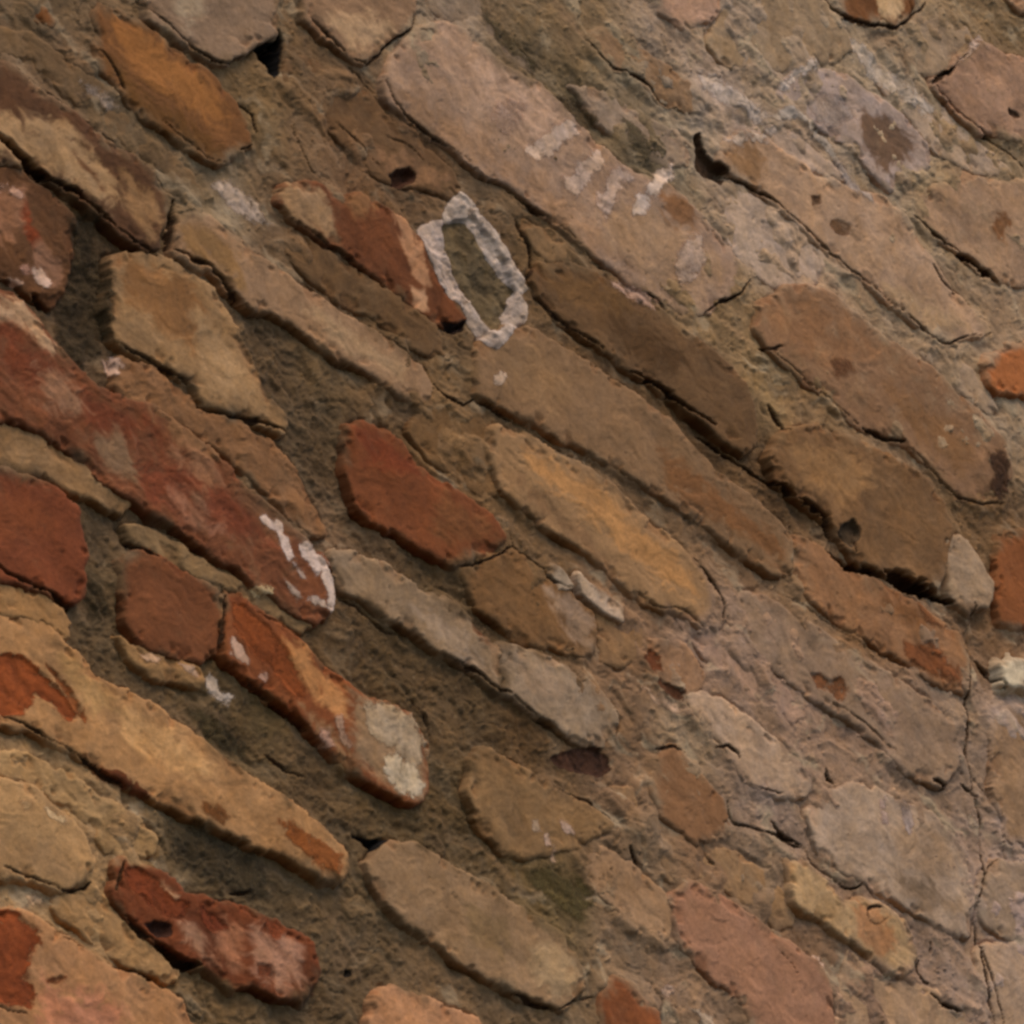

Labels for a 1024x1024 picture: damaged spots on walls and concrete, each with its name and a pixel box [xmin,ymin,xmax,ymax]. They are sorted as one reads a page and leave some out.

crack [932,665,1003,829]
crack [966,855,1003,1019]